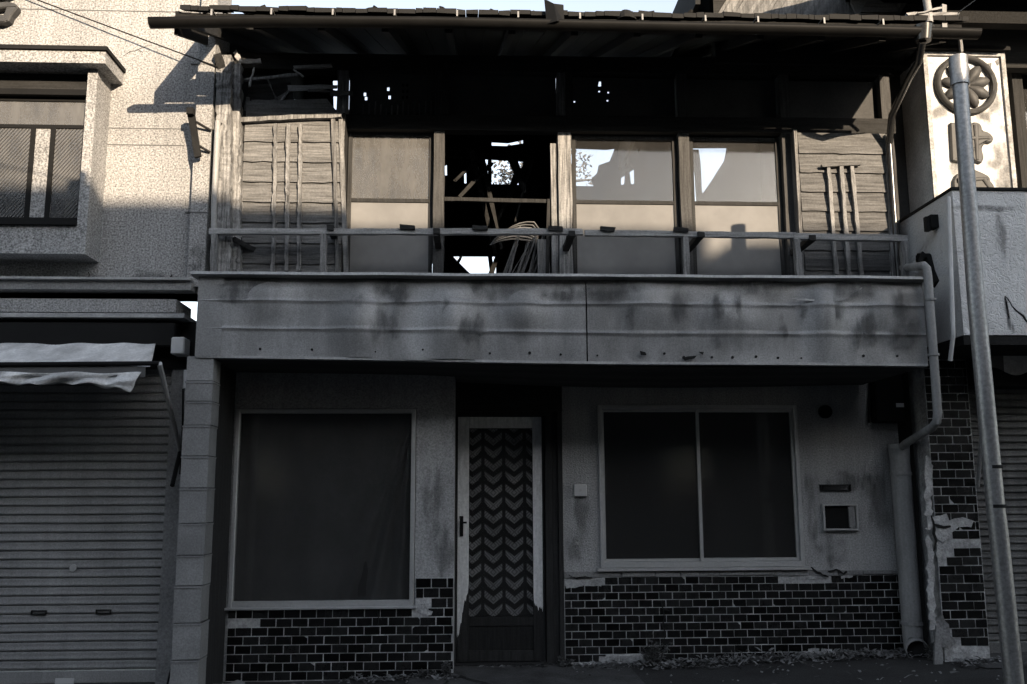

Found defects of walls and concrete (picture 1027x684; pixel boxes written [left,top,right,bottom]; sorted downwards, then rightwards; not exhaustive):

crack [1004,296,1027,322]
flaking render [923,455,974,648]